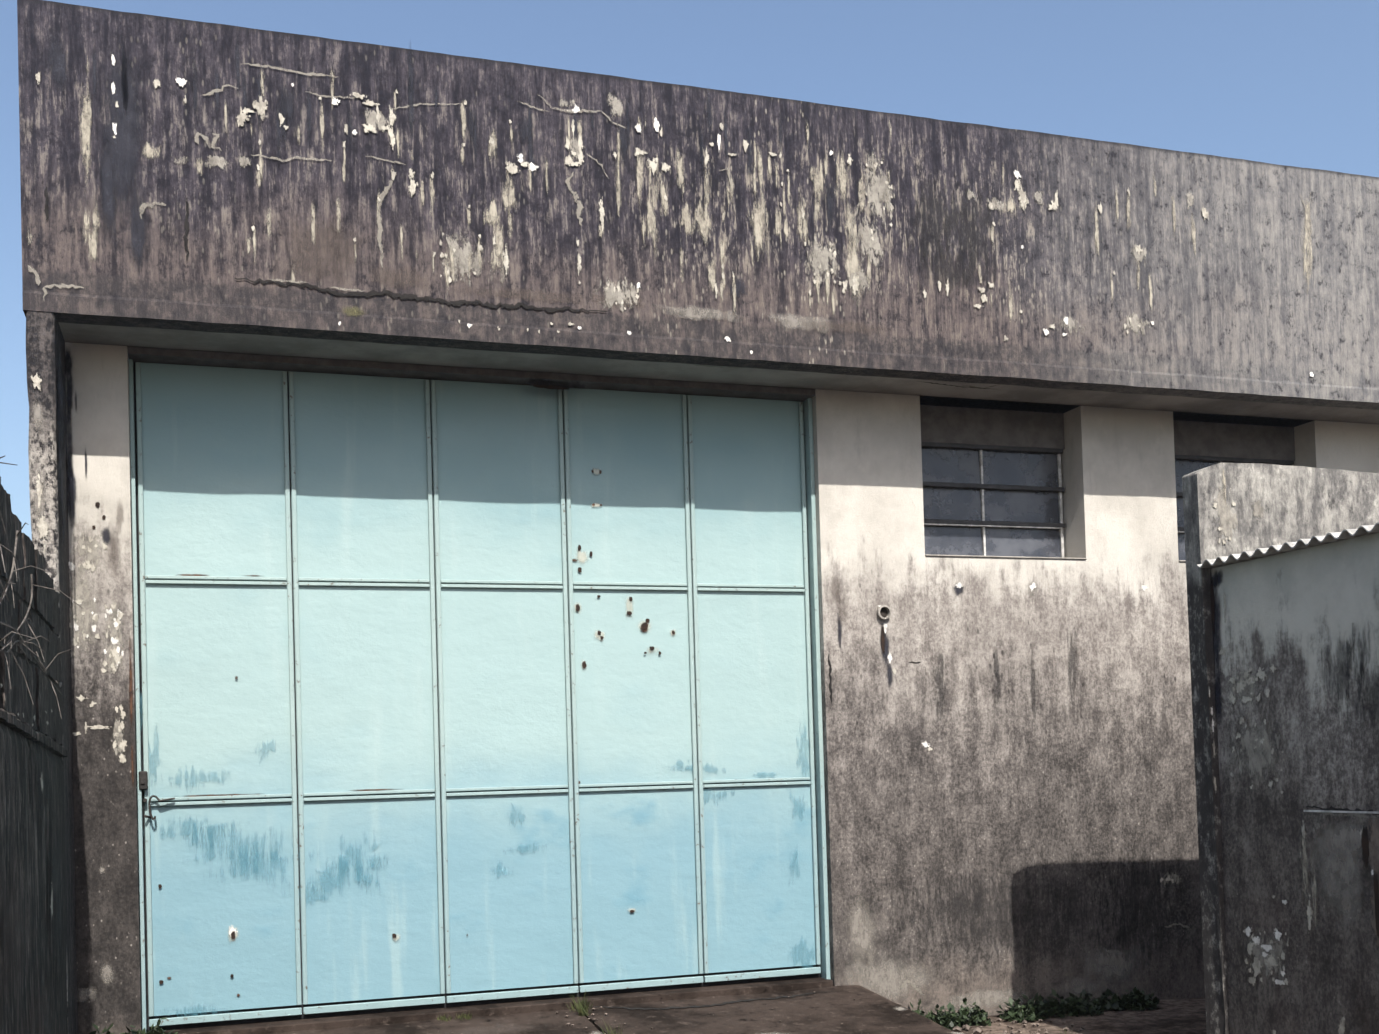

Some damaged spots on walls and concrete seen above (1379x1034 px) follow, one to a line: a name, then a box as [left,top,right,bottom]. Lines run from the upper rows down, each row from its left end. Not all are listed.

damp [80,49,145,260]
peeling [235,72,289,130]
peeling [332,92,396,149]
crack [235,153,609,313]
crack [394,102,459,110]
peeling [488,131,539,211]
peeling [556,94,662,166]
damp [599,94,745,319]
damp [748,118,871,330]
corrosion [572,545,593,573]
corrosion [627,597,661,655]
crack [1306,806,1379,819]